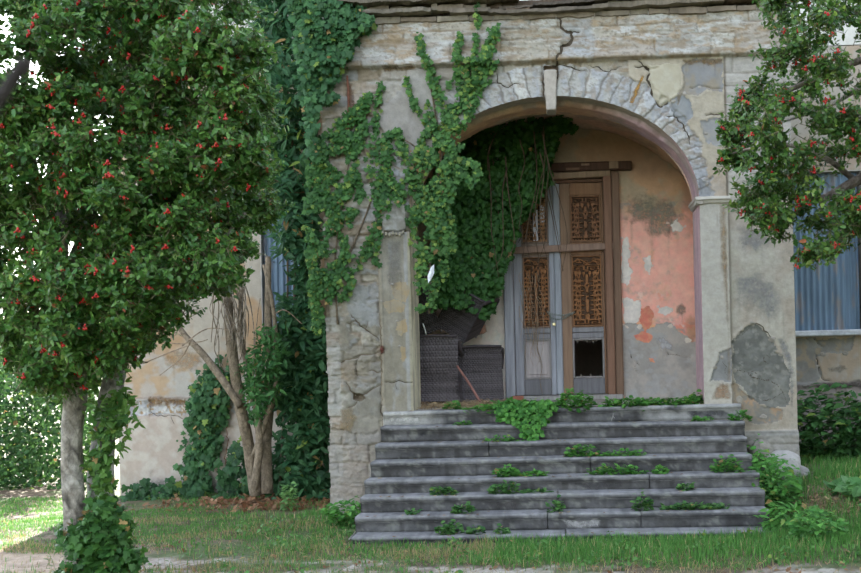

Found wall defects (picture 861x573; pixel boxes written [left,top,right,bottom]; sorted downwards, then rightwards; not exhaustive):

crack [542,19,690,144]
flaking render [648,57,724,146]
peeling [620,237,633,285]
leakage [632,201,676,234]
peeling [666,219,686,232]
flaking render [622,297,697,398]
flaking render [711,321,855,425]